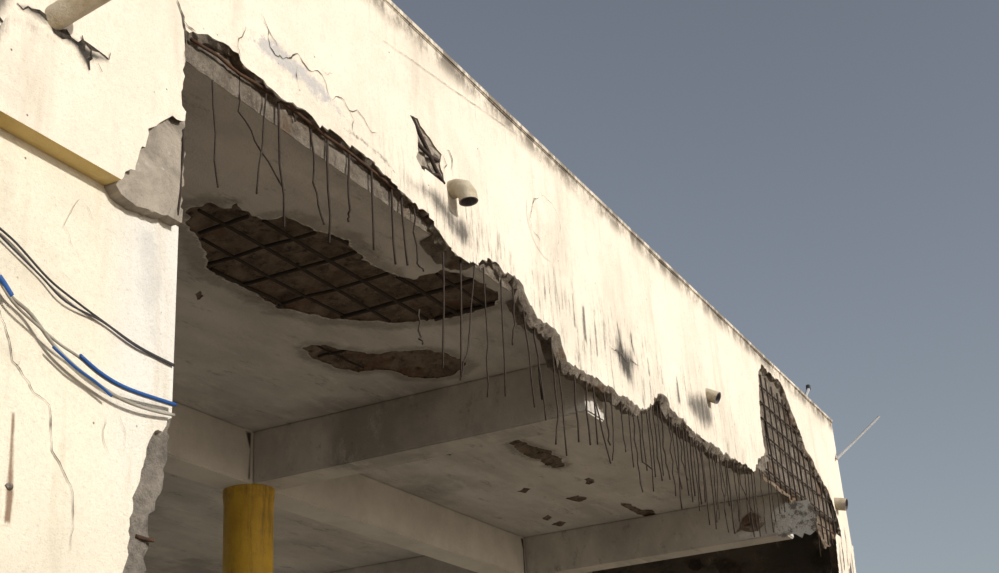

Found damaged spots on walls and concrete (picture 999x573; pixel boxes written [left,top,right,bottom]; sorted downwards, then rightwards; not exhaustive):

crack [238,15,376,133]
rust [0,408,18,528]
crack [0,311,74,536]
leakage [120,157,516,386]
spalling [171,15,845,573]
leakage [528,259,719,443]
leakage [605,564,660,573]